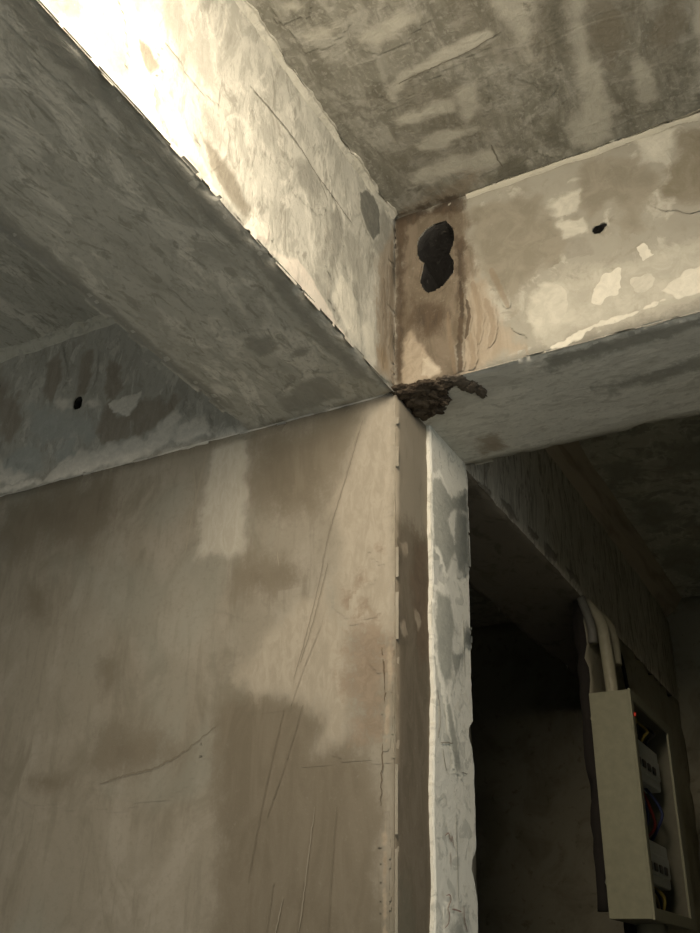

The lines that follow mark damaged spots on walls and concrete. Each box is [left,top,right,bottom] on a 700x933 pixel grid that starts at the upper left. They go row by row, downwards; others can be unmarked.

crack [253,89,351,224]
peeling [470,121,700,333]
peeling [47,388,145,419]
damp [0,0,434,933]
spalling [389,326,487,421]
peeling [550,266,700,349]